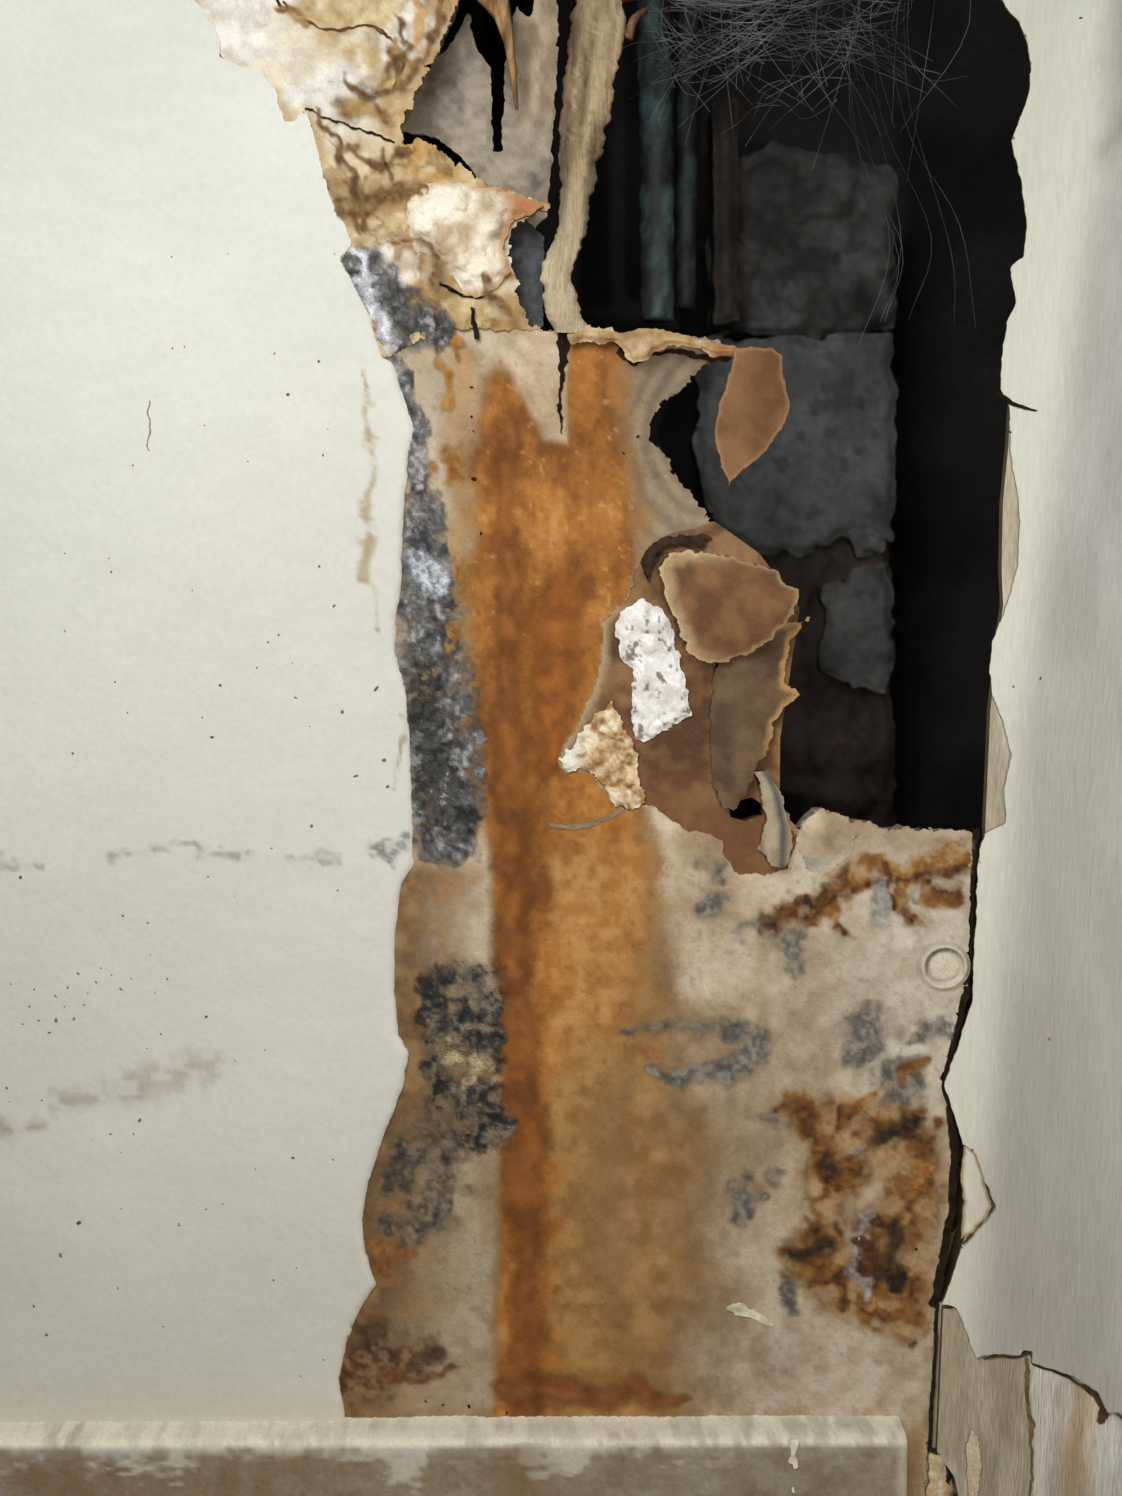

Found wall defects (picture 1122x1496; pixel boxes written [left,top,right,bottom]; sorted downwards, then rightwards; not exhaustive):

crack [276,0,405,87]
crack [305,108,395,143]
spalling [194,0,568,666]
water stain [316,0,487,867]
peeling [600,336,729,626]
corrosion [433,307,697,1417]
water stain [737,840,972,976]
peeling [339,740,508,1418]
water stain [368,961,517,1278]
peeling [565,679,1122,1496]
water stain [767,1007,953,1347]
crack [983,1351,1122,1496]